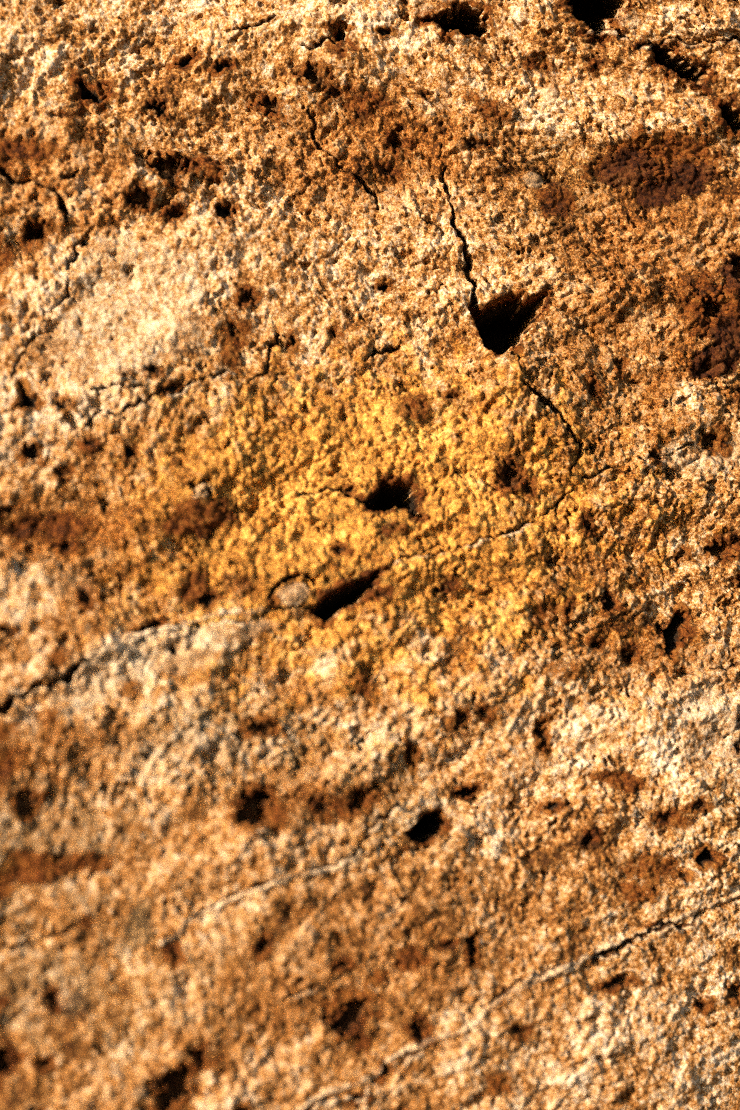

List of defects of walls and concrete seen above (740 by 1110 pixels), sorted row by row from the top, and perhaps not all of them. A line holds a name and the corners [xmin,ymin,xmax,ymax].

crack [426,145,480,323]
crack [267,573,312,612]
crack [0,619,246,716]
crack [186,805,421,926]
crack [467,915,700,1023]
crack [309,1088,368,1110]
crack [389,1050,423,1069]